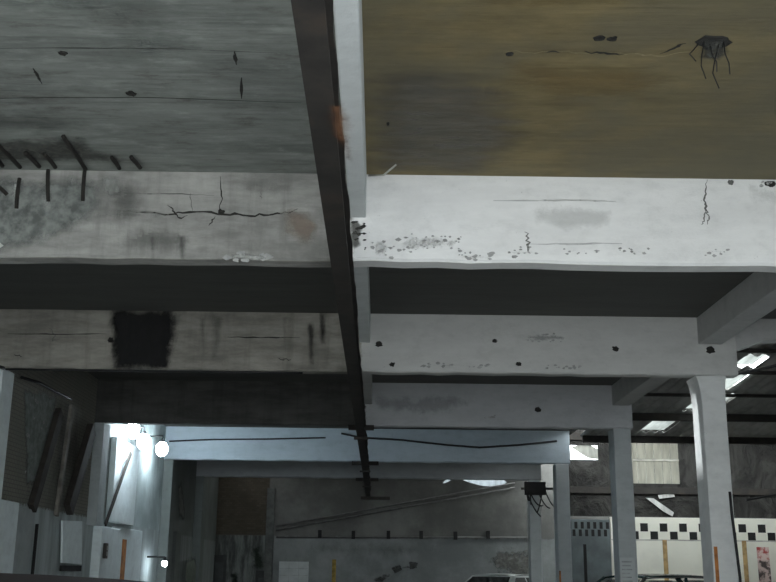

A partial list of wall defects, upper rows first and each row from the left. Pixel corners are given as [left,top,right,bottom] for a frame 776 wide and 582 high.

spalling [689,35,733,89]
spalling [0,135,142,248]
crack [134,176,297,225]
crack [701,180,710,225]